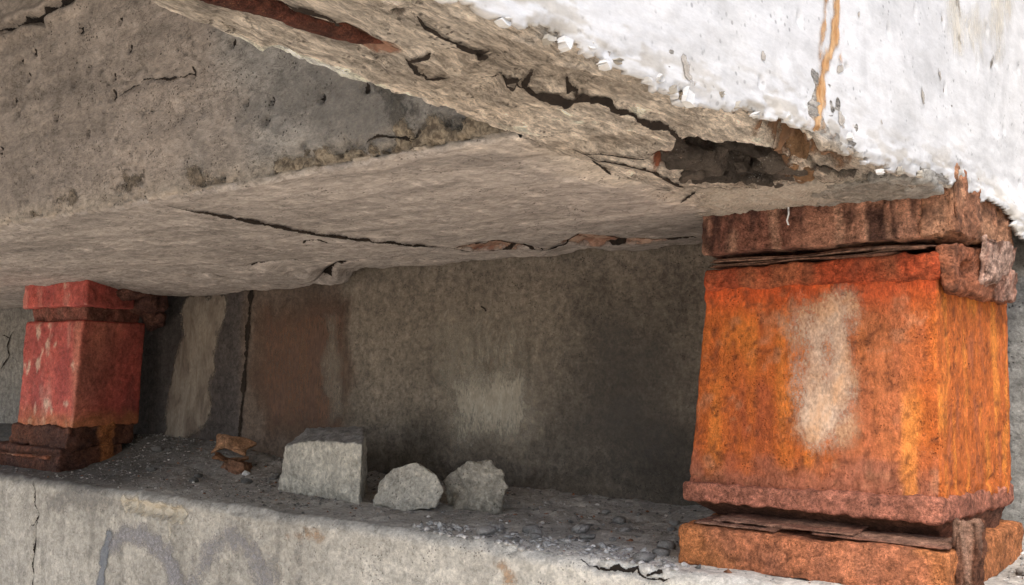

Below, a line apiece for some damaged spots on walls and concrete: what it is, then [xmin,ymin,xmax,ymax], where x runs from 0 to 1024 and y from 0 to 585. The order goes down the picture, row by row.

spalling [199,0,401,53]
crack [405,16,687,142]
peeling [542,34,574,53]
rust [813,0,842,131]
damp [356,84,418,146]
crack [574,149,695,203]
spalling [660,91,944,217]
crack [165,205,627,276]
rust [710,234,1018,305]
rust [116,288,169,316]
rust [694,513,953,550]
crack [580,559,670,582]